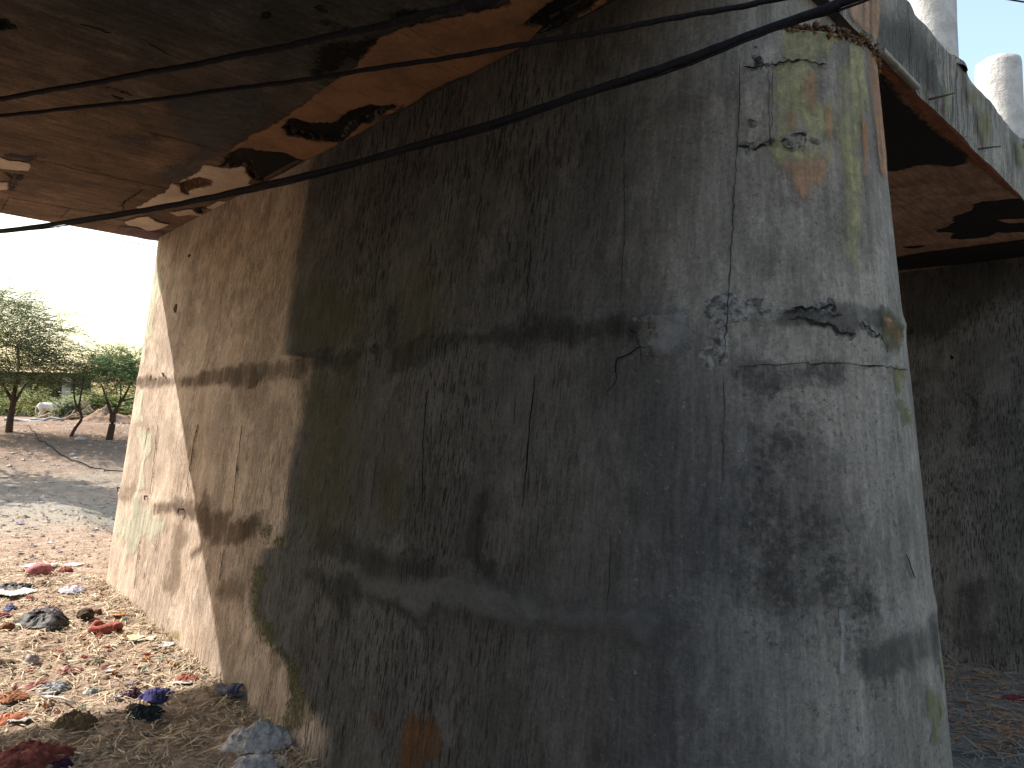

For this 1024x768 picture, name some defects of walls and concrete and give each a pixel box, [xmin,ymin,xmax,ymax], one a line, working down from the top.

spalling [743,45,764,72]
peeling [124,0,607,231]
crack [738,127,807,155]
rust [862,56,1021,199]
spalling [937,198,1024,239]
damp [137,363,258,388]
crack [611,328,653,388]
spalling [698,290,787,371]
crack [735,297,907,376]
damp [115,486,257,589]